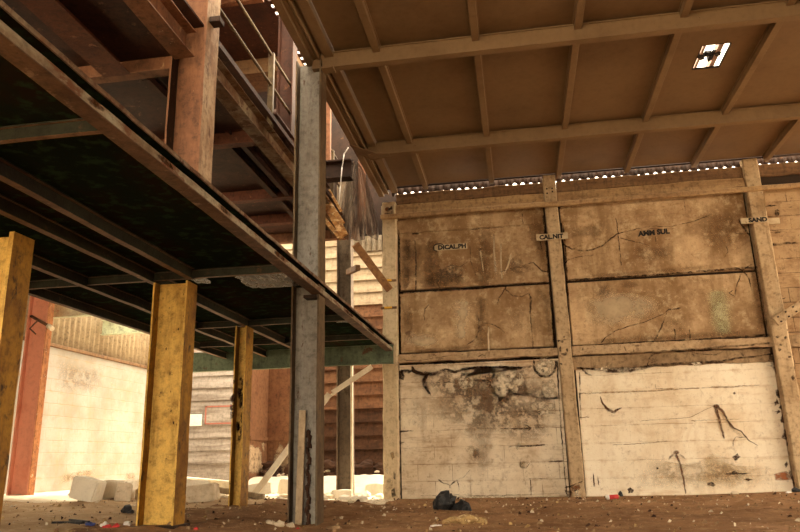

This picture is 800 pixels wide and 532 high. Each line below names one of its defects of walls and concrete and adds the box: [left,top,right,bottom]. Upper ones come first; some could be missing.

crack [563,206,707,265]
crack [602,307,770,365]
crack [399,366,525,394]
leakage [439,371,525,426]
peeling [493,370,524,397]
crack [578,385,756,445]